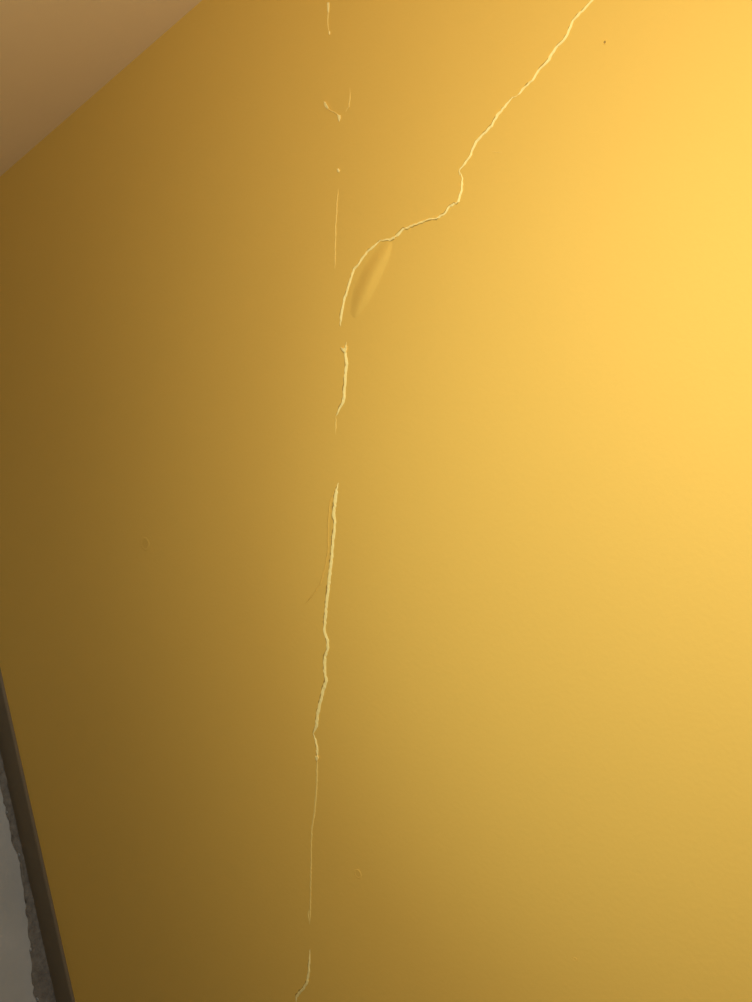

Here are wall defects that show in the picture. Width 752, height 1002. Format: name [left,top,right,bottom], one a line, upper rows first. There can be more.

crack [324,97,350,121]
crack [334,0,594,433]
crack [306,483,339,924]
crack [295,950,310,1002]